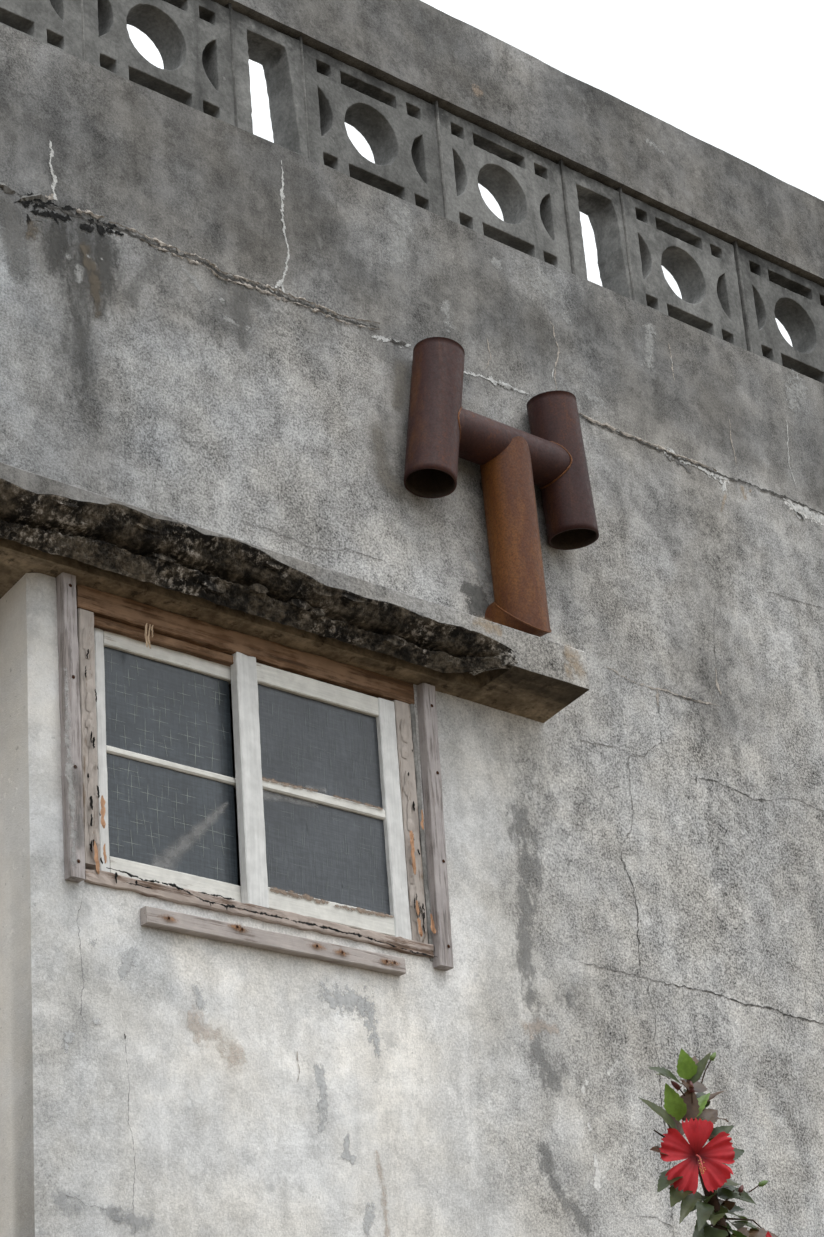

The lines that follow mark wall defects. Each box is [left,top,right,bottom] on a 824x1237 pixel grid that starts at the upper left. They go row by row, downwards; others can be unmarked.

crack [0,141,411,348]
crack [464,321,560,394]
crack [579,413,824,522]
spalling [0,478,518,676]
crack [579,599,824,1131]